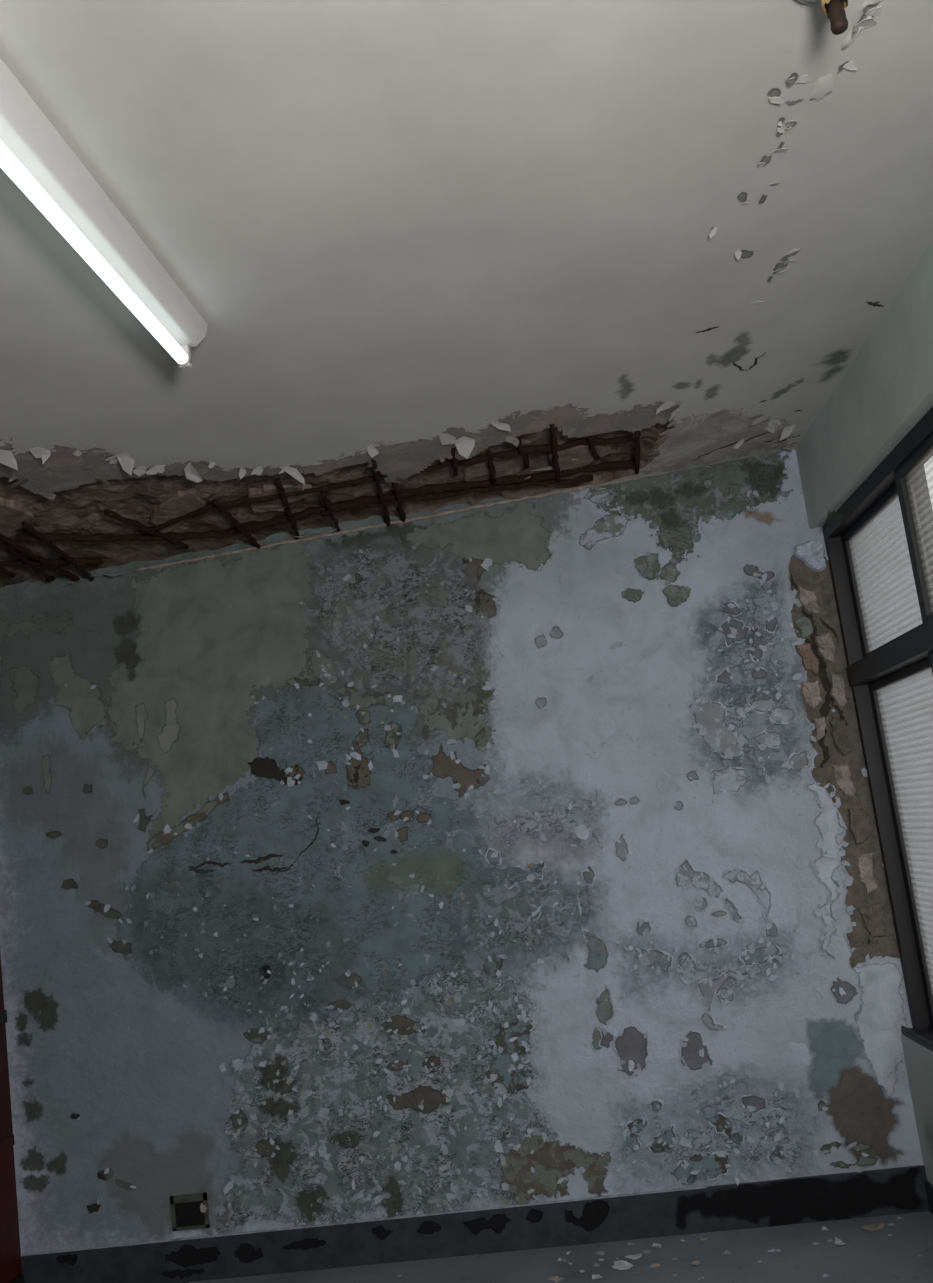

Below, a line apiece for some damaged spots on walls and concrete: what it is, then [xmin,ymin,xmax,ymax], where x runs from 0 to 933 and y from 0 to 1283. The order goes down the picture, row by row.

peeling [758,73,811,168]
peeling [738,182,780,205]
peeling [735,249,753,260]
peeling [767,248,801,284]
leakage [589,452,793,566]
leakage [326,521,426,551]
leakage [113,612,141,680]
flaking render [0,401,900,1250]
leakage [676,1020,924,1229]
spalling [56,1254,77,1265]
spalling [162,1243,263,1279]